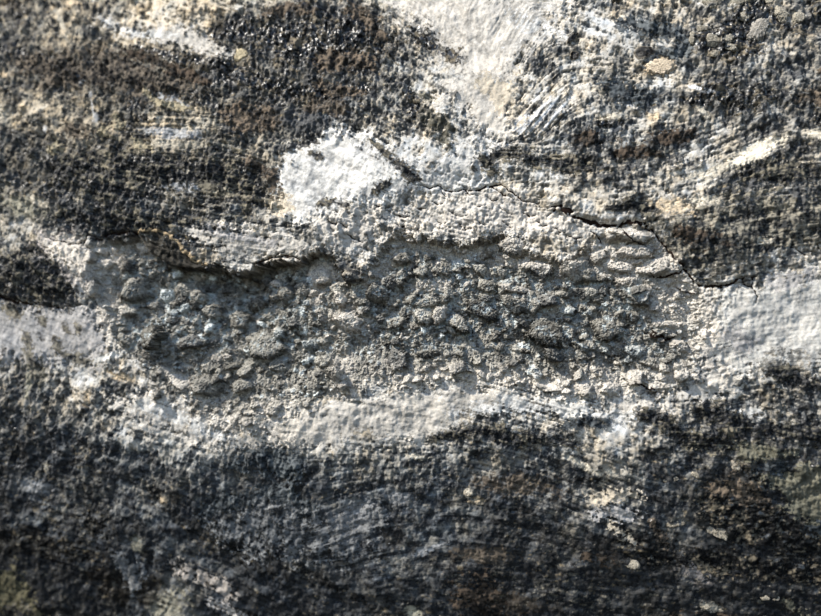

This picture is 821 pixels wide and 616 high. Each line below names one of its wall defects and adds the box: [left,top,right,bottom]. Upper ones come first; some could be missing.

damp [610,0,808,72]
damp [677,74,784,116]
damp [0,0,661,389]
damp [732,156,821,190]
crack [375,184,758,303]
damp [671,222,739,252]
spalling [76,218,715,442]
damp [102,254,821,599]
damp [204,596,248,616]